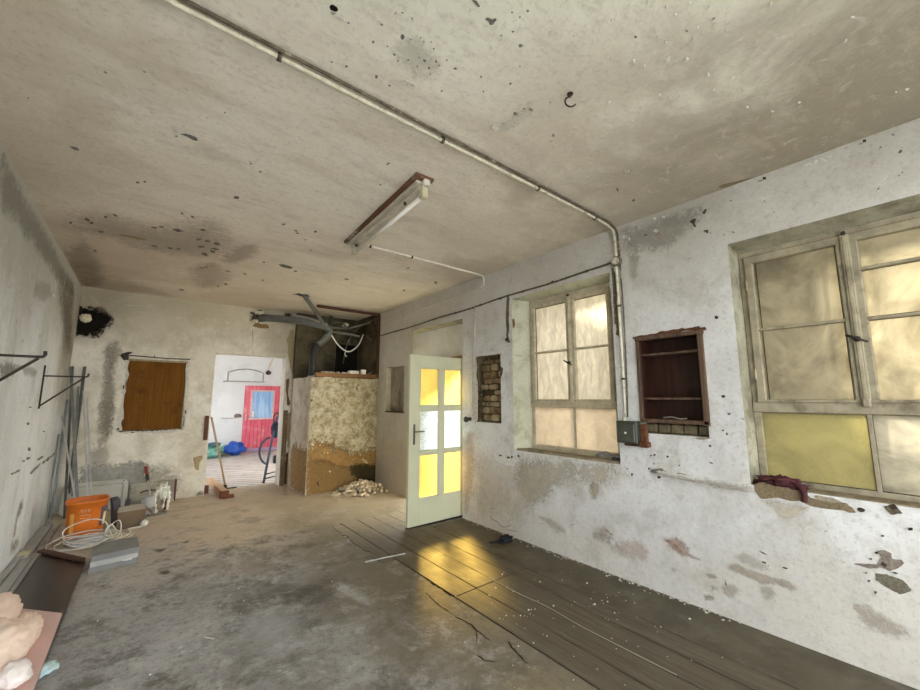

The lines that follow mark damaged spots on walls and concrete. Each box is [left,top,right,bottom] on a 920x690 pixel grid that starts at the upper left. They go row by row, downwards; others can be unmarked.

flaking render [474,296,515,424]
damp [101,342,121,437]
flaking render [754,482,865,513]
flaking render [884,504,903,515]
flaking render [665,539,688,556]
peeling [855,550,911,594]
crack [426,578,528,664]